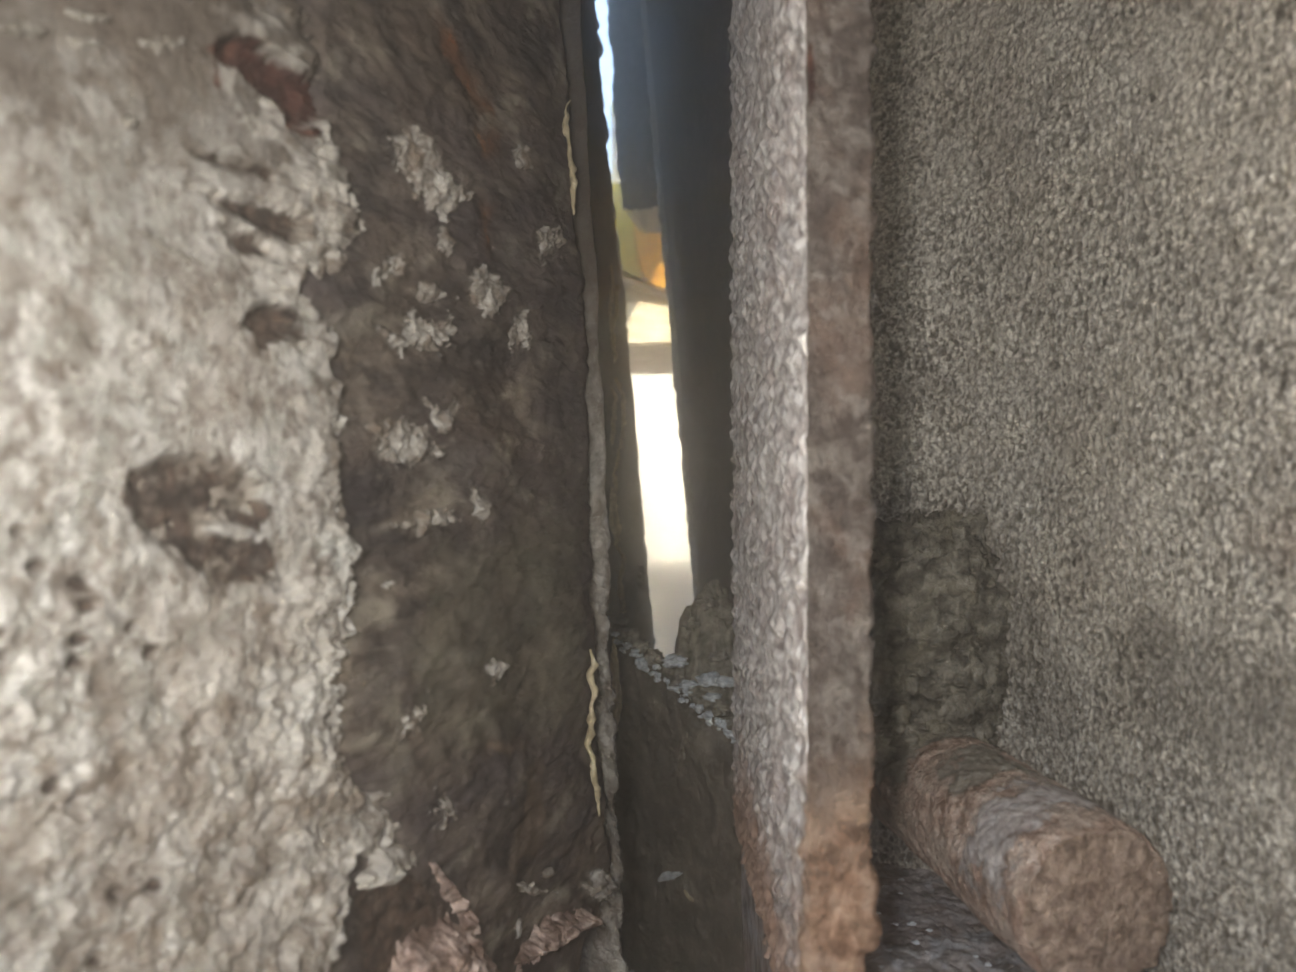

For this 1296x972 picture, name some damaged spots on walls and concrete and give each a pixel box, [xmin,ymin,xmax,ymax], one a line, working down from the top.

rust [205,37,322,137]
peeling [192,153,271,181]
peeling [218,200,293,256]
spalling [121,449,274,596]
spalling [295,0,611,972]
crack [584,637,623,816]